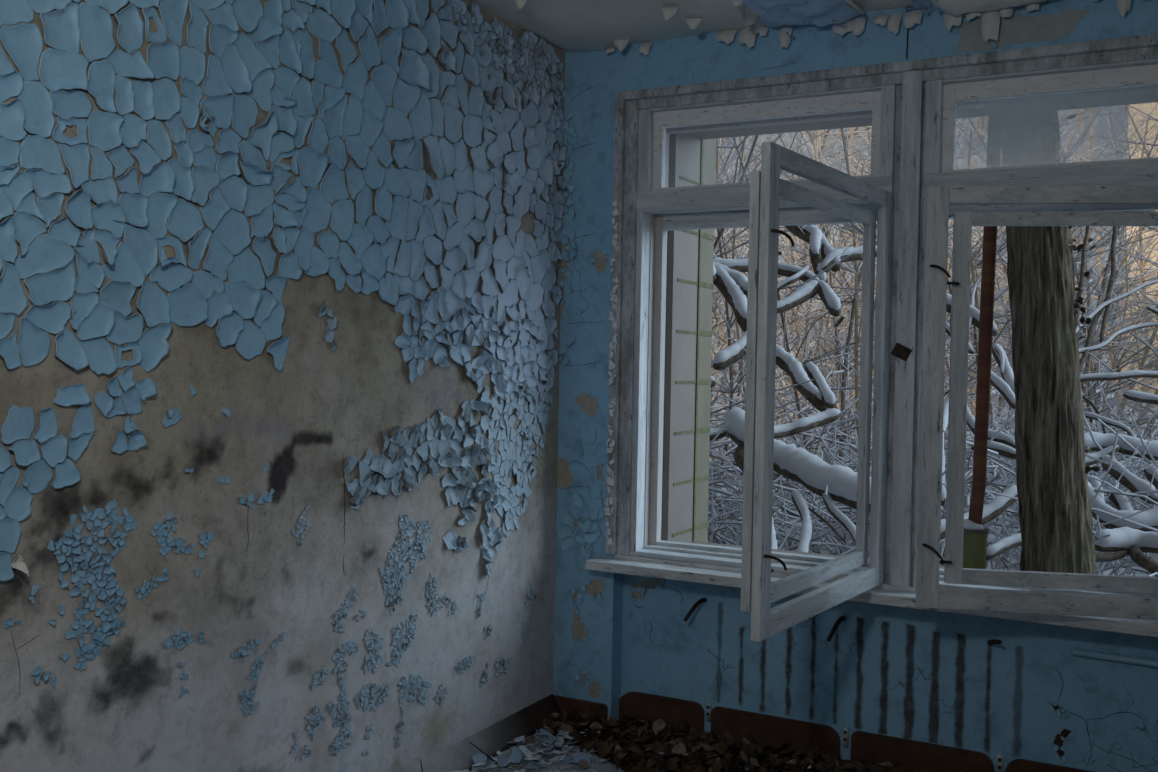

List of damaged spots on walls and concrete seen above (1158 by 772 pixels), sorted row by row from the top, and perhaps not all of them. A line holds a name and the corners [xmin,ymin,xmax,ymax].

peeling [0,0,570,761]
water stain [52,490,106,517]
water stain [194,439,221,472]
water stain [269,433,332,502]
water stain [97,646,157,709]
water stain [855,617,864,729]
water stain [879,622,889,734]
water stain [904,625,915,739]
water stain [929,632,939,743]
water stain [955,634,965,747]
crack [1056,669,1158,772]